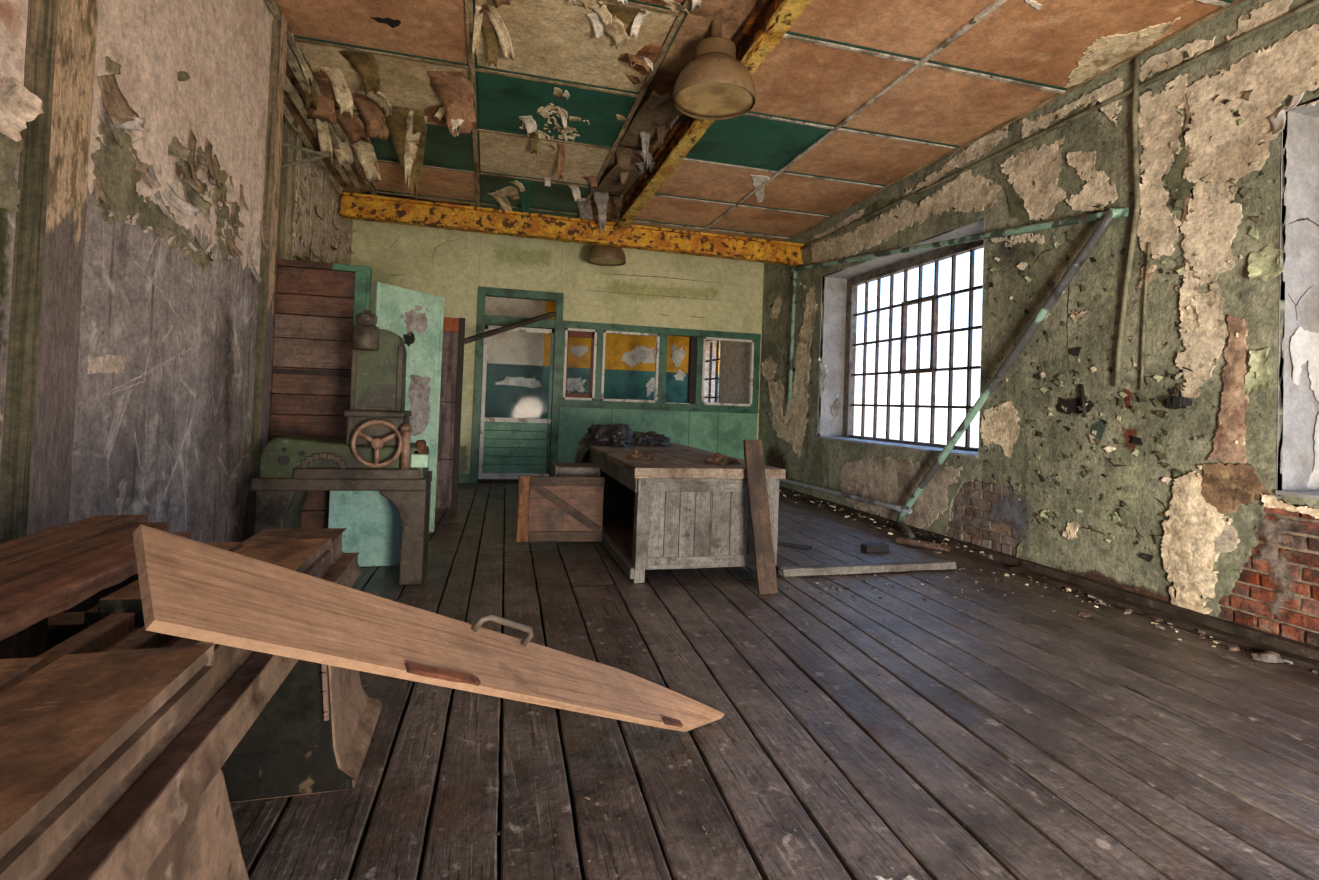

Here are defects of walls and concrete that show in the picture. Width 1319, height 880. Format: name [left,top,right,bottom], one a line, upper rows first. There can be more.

peeling [472,0,515,69]
peeling [568,0,701,84]
peeling [0,77,44,214]
peeling [91,56,270,282]
peeling [286,33,476,262]
peeling [409,87,590,240]
rust [616,117,704,229]
peeling [750,175,770,203]
peeling [567,377,587,393]
peeling [621,343,686,397]
peeling [719,255,840,457]
peeling [811,0,1319,647]